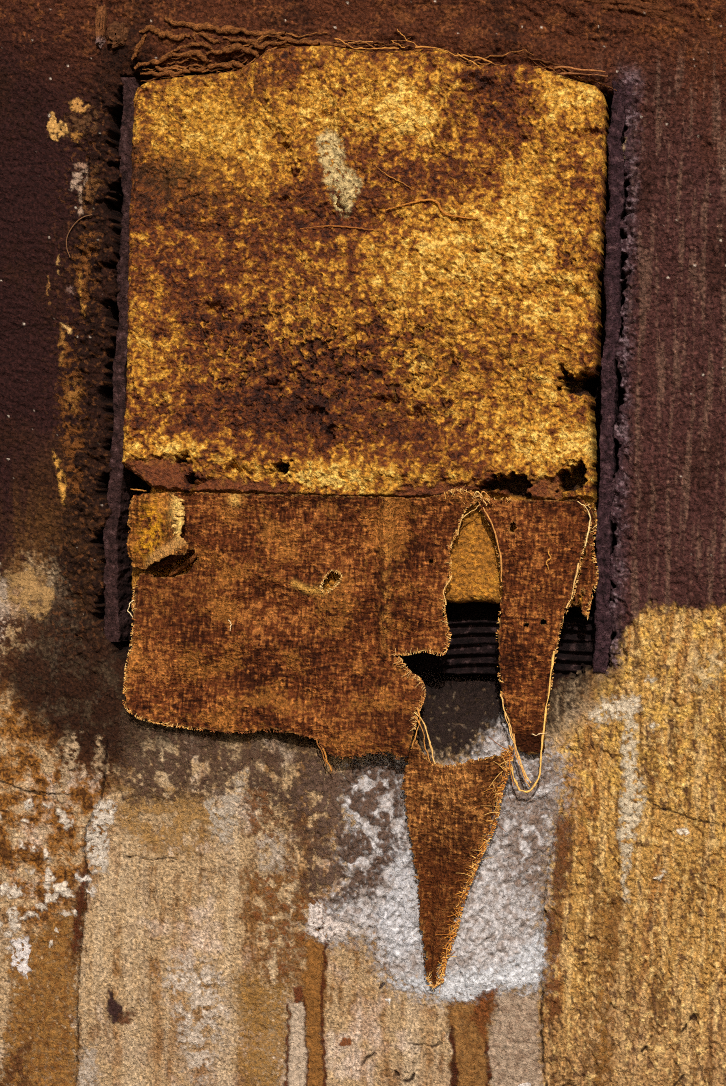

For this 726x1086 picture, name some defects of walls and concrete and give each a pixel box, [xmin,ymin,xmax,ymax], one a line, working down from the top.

crack [0,780,70,796]
crack [75,740,108,1085]
flaking render [307,713,565,1086]